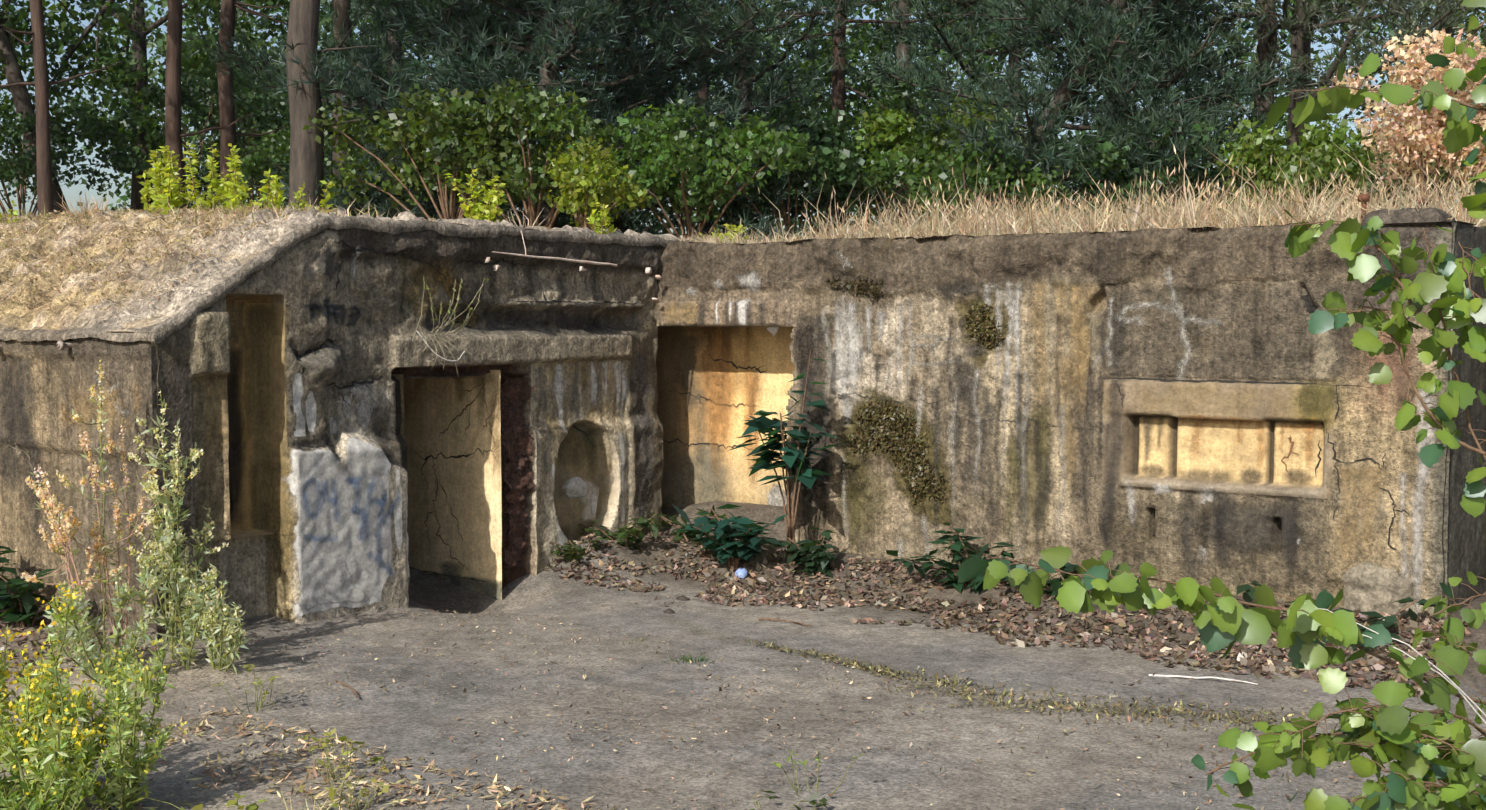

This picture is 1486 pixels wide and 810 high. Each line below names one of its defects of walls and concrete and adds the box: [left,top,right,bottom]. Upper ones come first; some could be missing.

crack [414,380,500,584]
damp [799,286,1063,523]
damp [1079,316,1134,536]
crack [826,267,1411,554]
damp [1144,417,1162,474]